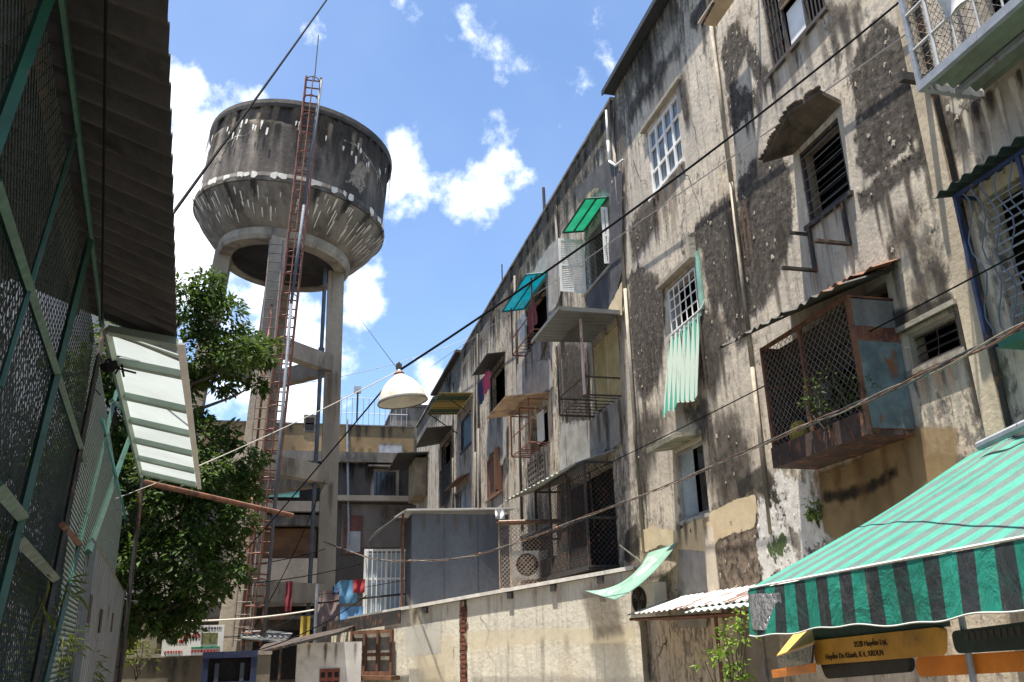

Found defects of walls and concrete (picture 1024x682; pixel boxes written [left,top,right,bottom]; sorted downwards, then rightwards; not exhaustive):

water stain [192,178,281,228]
water stain [204,105,280,155]
water stain [295,188,384,262]
water stain [292,107,392,198]
water stain [460,0,689,373]
water stain [723,187,742,304]
peeling [715,469,831,590]